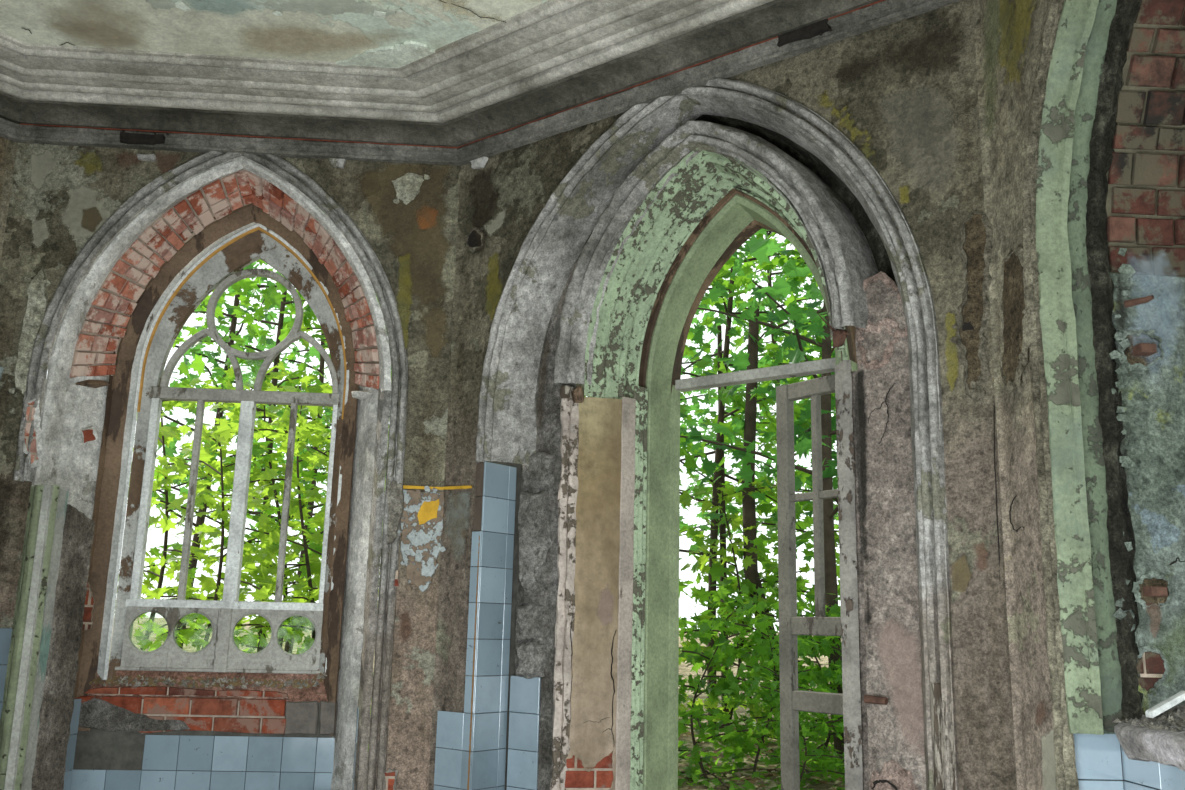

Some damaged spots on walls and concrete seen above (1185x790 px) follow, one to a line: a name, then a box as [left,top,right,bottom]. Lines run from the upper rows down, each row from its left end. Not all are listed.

peeling [146,0,403,18]
crack [439,0,506,23]
peeling [335,41,435,68]
peeling [62,185,111,240]
peeling [33,219,48,247]
flaking render [1107,0,1185,500]
flaking render [70,169,379,389]
peeling [389,486,469,592]
crack [872,780,898,790]